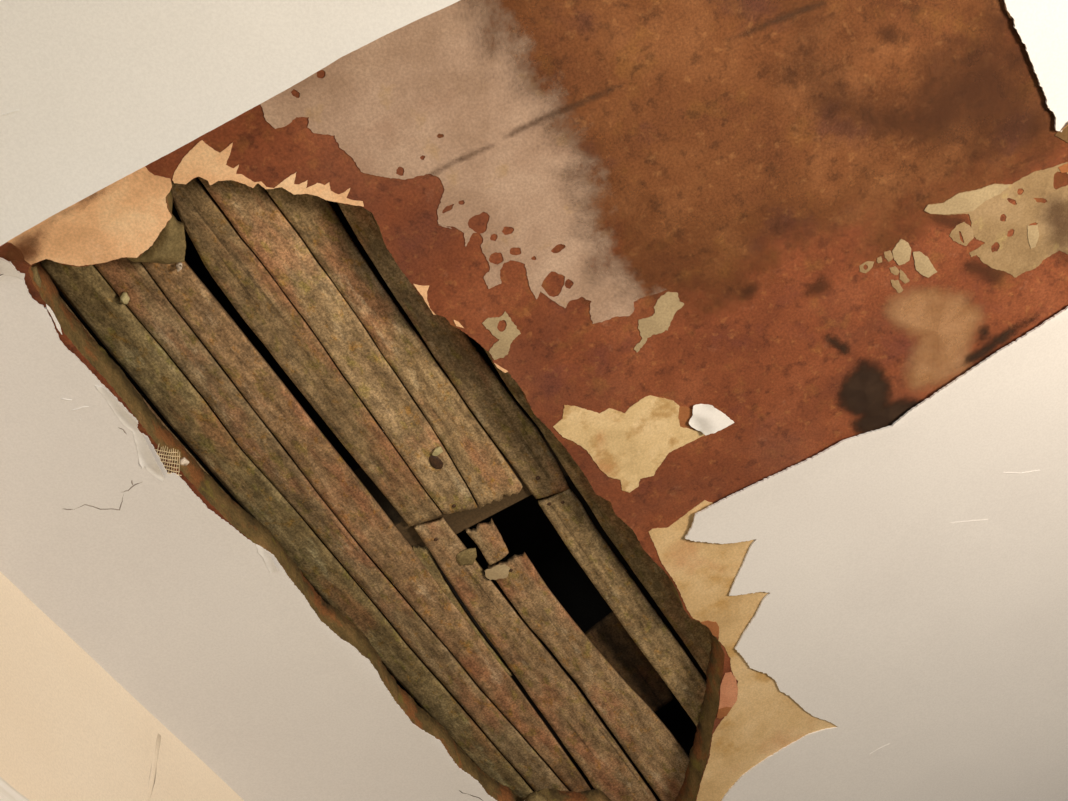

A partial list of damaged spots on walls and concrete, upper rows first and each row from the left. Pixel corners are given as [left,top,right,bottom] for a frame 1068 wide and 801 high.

water stain [482,0,1050,291]
flaking render [145,0,1068,622]
water stain [842,366,917,432]
water stain [900,295,971,381]
crack [65,481,139,510]
flaking render [0,233,525,801]
flaking render [675,633,738,801]